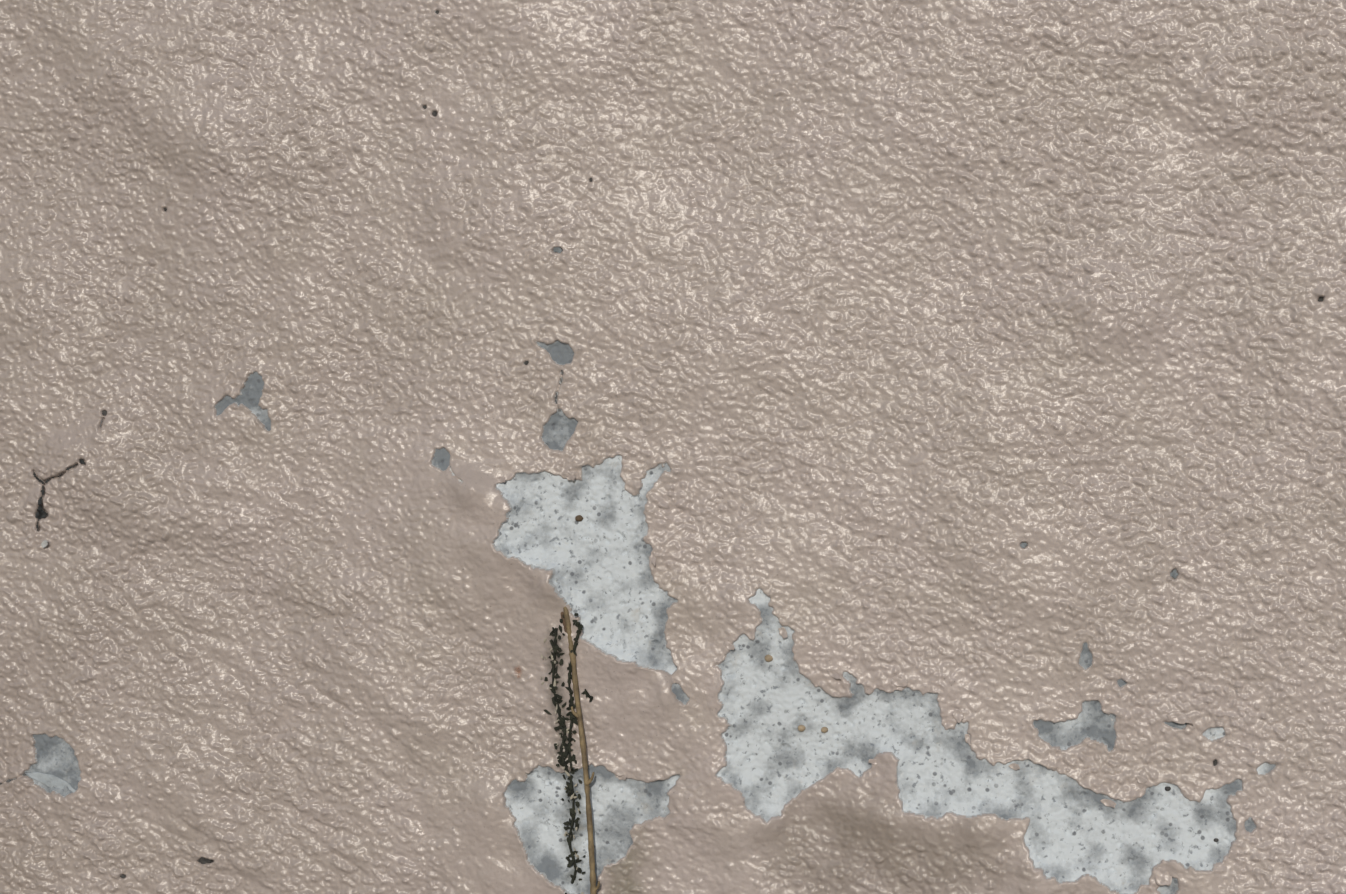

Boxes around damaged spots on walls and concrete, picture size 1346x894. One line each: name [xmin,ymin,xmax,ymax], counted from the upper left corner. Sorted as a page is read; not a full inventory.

peeling [383,0,537,60]
peeling [192,345,296,460]
crack [33,459,85,548]
peeling [397,315,1283,894]
peeling [0,708,107,824]